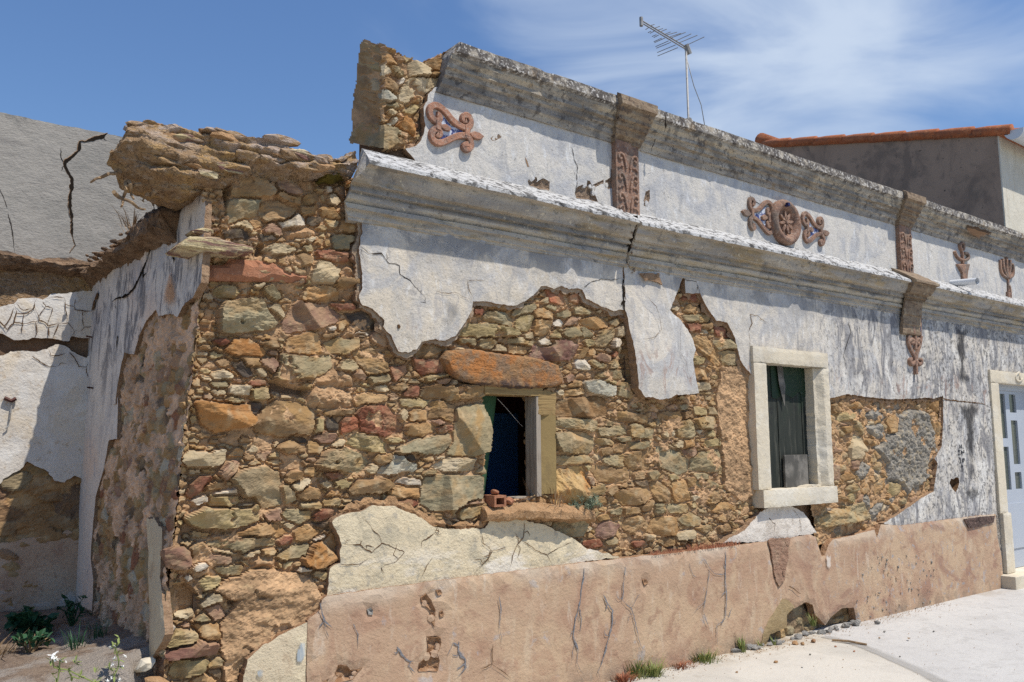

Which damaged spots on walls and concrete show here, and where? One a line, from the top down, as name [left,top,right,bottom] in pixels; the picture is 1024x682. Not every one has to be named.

crack [60,133,108,253]
spalling [575,177,611,202]
crack [0,249,175,376]
crack [585,215,690,376]
flaking render [683,293,748,374]
crack [341,516,440,578]
flaking render [339,496,487,529]
crack [476,523,571,571]
crack [569,567,643,676]
spalling [761,537,939,645]
spalling [811,394,942,546]